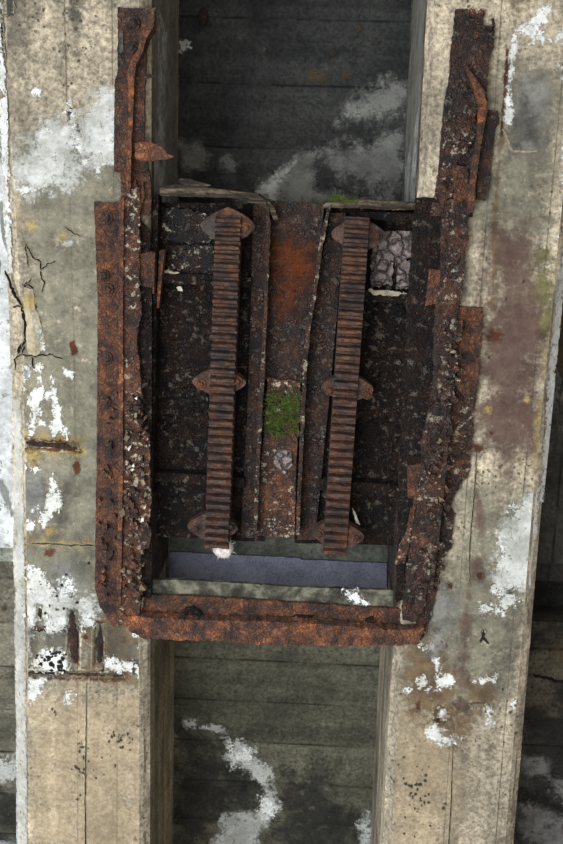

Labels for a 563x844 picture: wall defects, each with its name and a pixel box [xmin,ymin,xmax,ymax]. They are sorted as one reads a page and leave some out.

water stain [508,2,563,67]
water stain [236,0,425,204]
crack [4,243,64,370]
rust [443,323,463,384]
water stain [0,87,139,844]
rust [427,434,454,527]
water stain [403,235,563,747]
rust [471,560,485,581]
rust [82,617,138,684]
rust [406,564,495,747]
crack [533,674,563,683]
water stain [173,719,371,844]